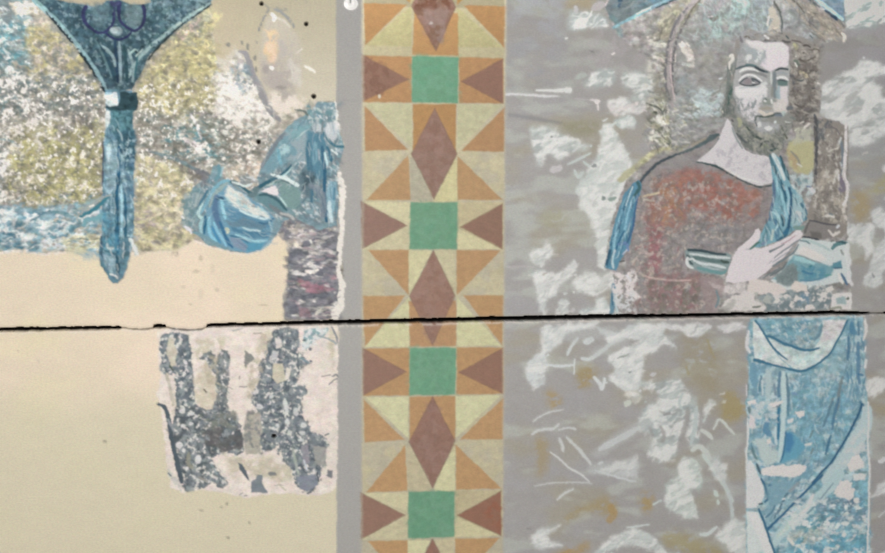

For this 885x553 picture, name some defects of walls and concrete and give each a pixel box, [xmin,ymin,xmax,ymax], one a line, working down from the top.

peeling [820,57,885,155]
peeling [847,207,885,289]
crack [0,308,885,335]
peeling [526,68,747,553]